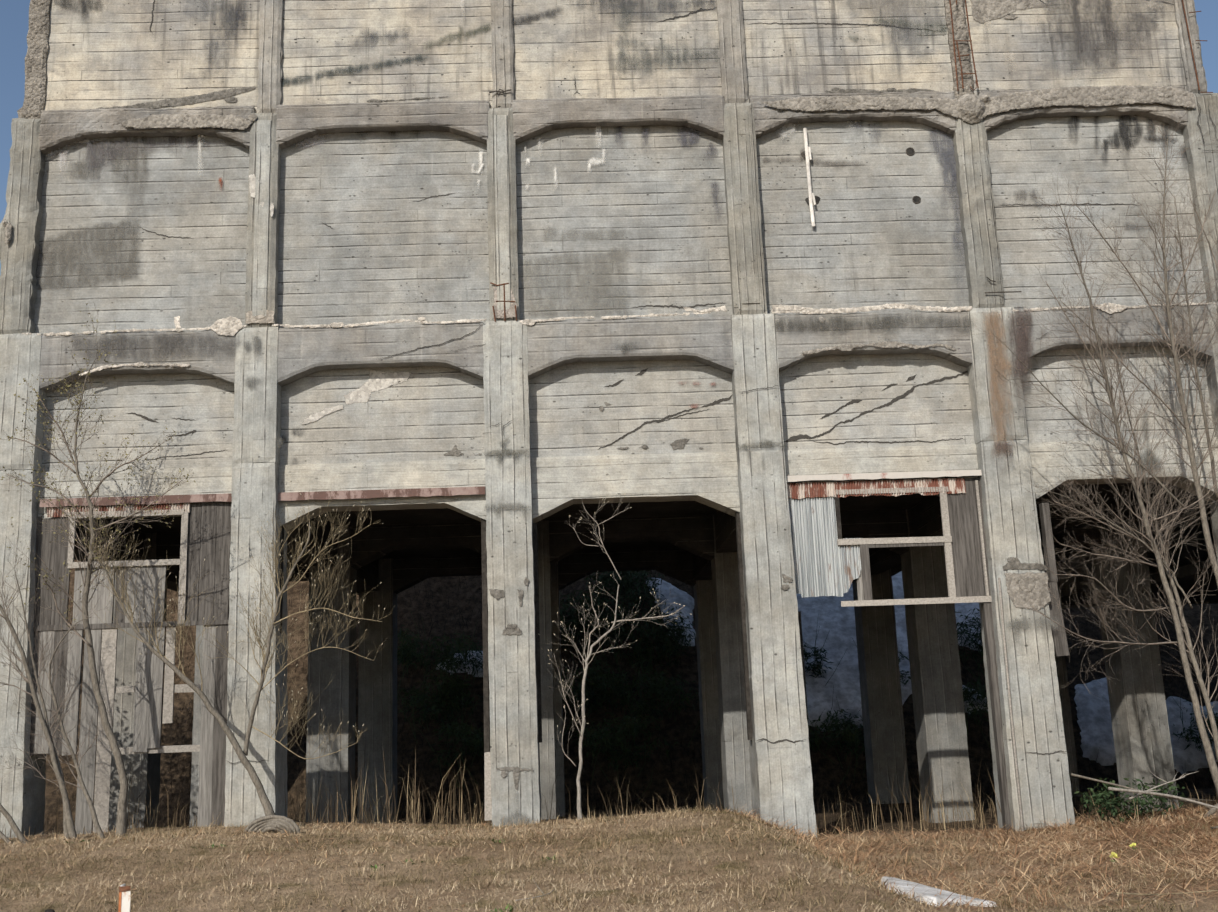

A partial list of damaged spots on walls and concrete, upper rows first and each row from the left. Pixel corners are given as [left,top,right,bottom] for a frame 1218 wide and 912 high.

crack [658,7,717,22]
crack [752,22,938,31]
spalling [763,0,1048,118]
spalling [982,0,1213,118]
leakage [1061,0,1163,59]
leakage [36,221,136,287]
spalling [22,282,727,336]
crack [599,385,778,449]
crack [785,370,968,445]
rust [986,310,1031,452]
rust [787,478,966,499]
spalling [1003,557,1051,611]